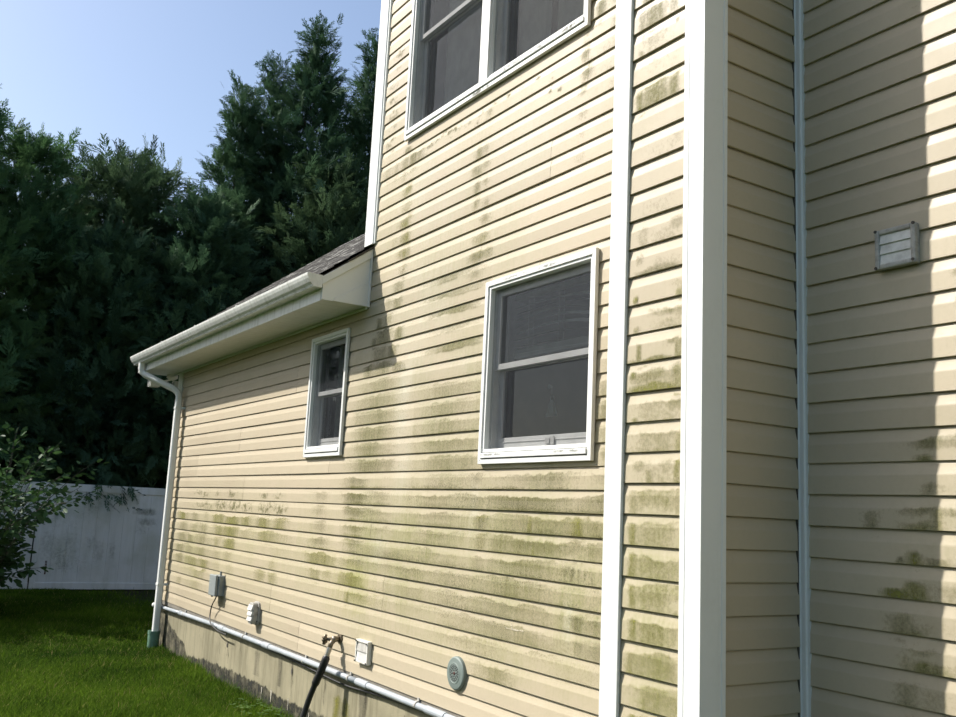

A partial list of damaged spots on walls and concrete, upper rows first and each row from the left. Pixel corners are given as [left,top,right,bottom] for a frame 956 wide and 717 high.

damp [439,337,479,352]
damp [631,345,680,392]
damp [206,492,285,549]
damp [345,443,379,542]
damp [496,488,558,571]
damp [885,583,926,601]